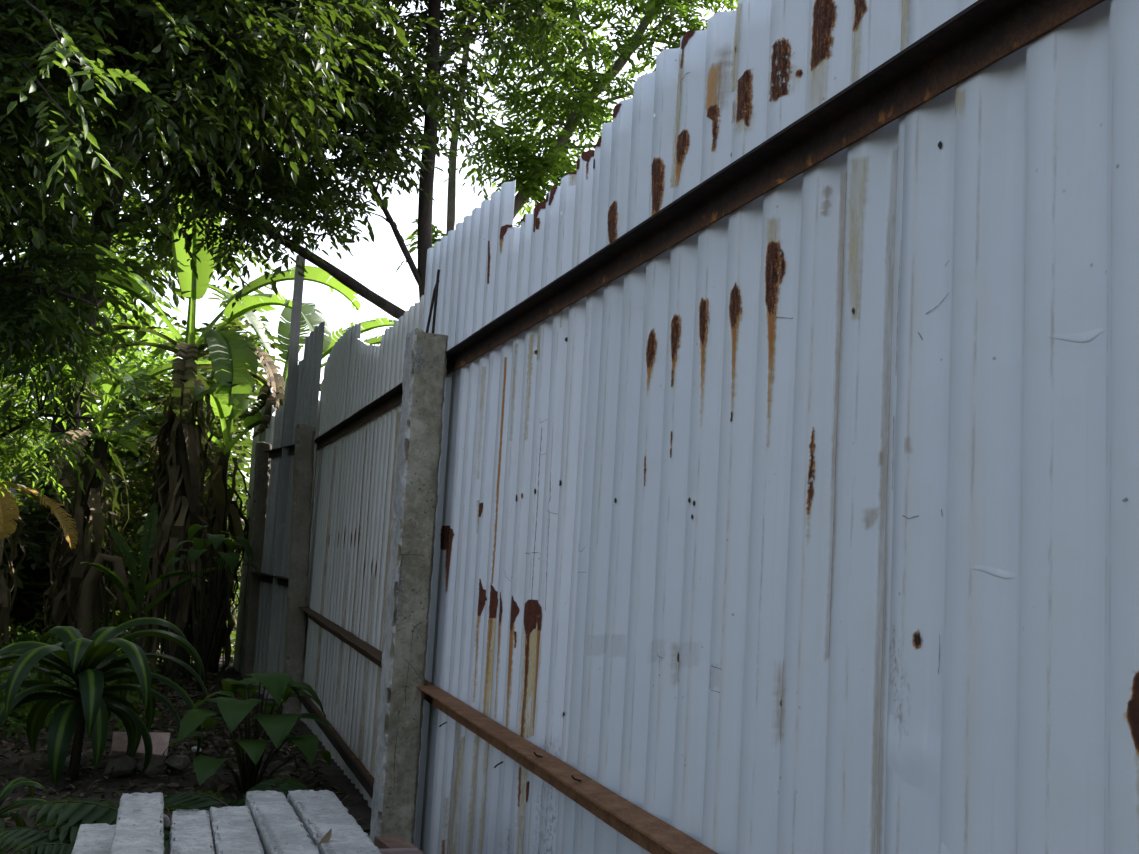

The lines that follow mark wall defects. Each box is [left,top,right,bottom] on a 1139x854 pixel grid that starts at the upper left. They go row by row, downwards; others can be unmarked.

rust [769,0,836,101]
rust [706,64,721,151]
rust [736,69,753,127]
rust [651,130,690,216]
rust [487,185,558,284]
rust [607,201,618,243]
rust [646,315,681,387]
rust [729,283,742,397]
rust [765,241,786,417]
rust [440,525,454,591]
rust [474,357,542,737]
rust [1125,672,1139,754]